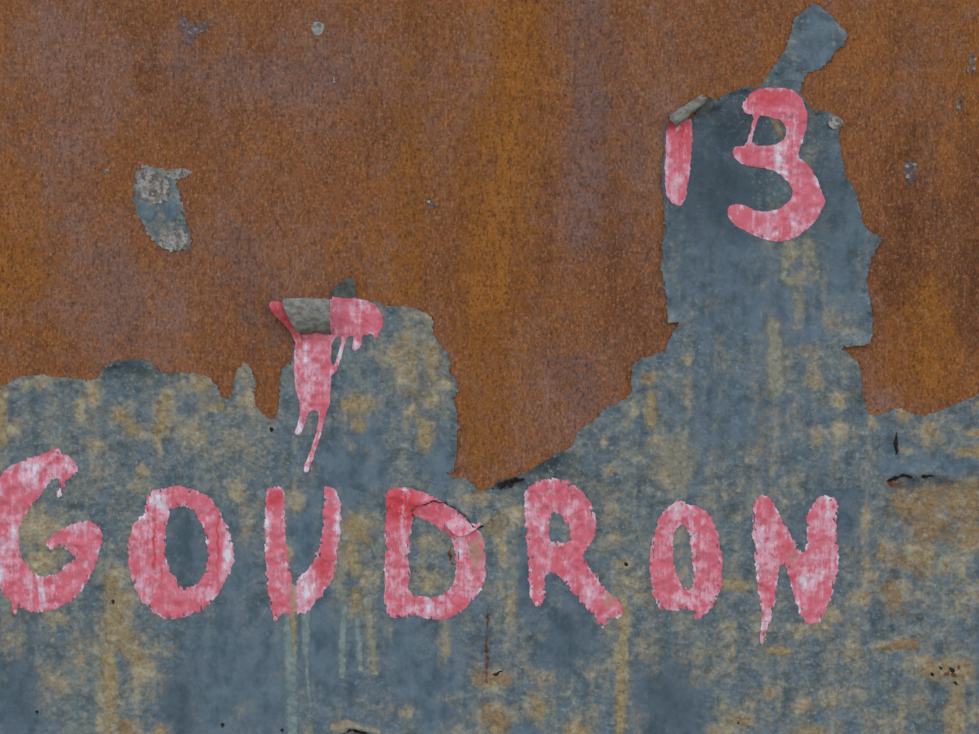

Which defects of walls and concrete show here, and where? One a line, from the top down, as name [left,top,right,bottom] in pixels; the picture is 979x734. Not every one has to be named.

peeling [666,93,707,127]
peeling [330,278,356,298]
peeling [282,298,332,339]
peeling [331,336,342,365]
rust [766,317,785,398]
rust [642,373,657,428]
peeling [497,477,525,489]
peeling [163,503,210,590]
peeling [404,515,459,599]
peeling [484,513,509,535]
peeling [548,512,571,546]
peeling [673,522,697,591]